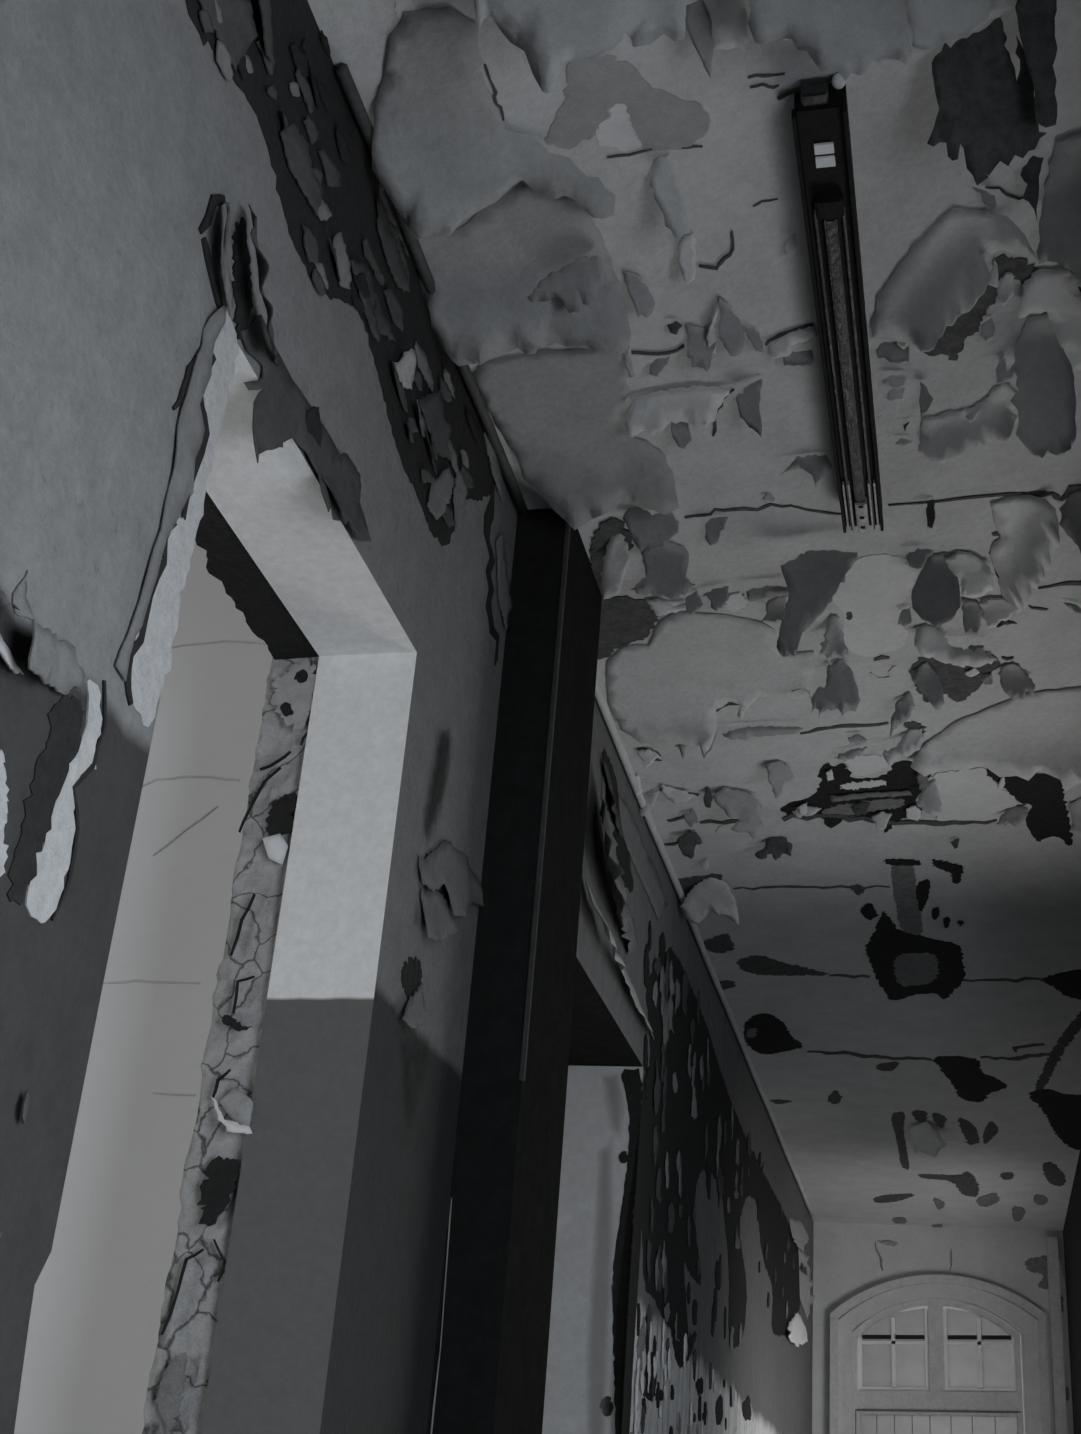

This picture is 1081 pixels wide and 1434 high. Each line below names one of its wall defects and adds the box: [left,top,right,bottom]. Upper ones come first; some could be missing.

peeling [185,0,1081,865]
spalling [0,194,371,923]
crack [172,640,267,649]
crack [142,775,240,856]
crack [103,977,200,985]
spalling [860,858,966,1000]
crack [153,1090,195,1098]
peeling [585,748,814,1434]
spalling [743,1013,1051,1104]
peeling [891,1110,1066,1221]
spalling [1028,1089,1081,1150]
spalling [161,1156,239,1335]